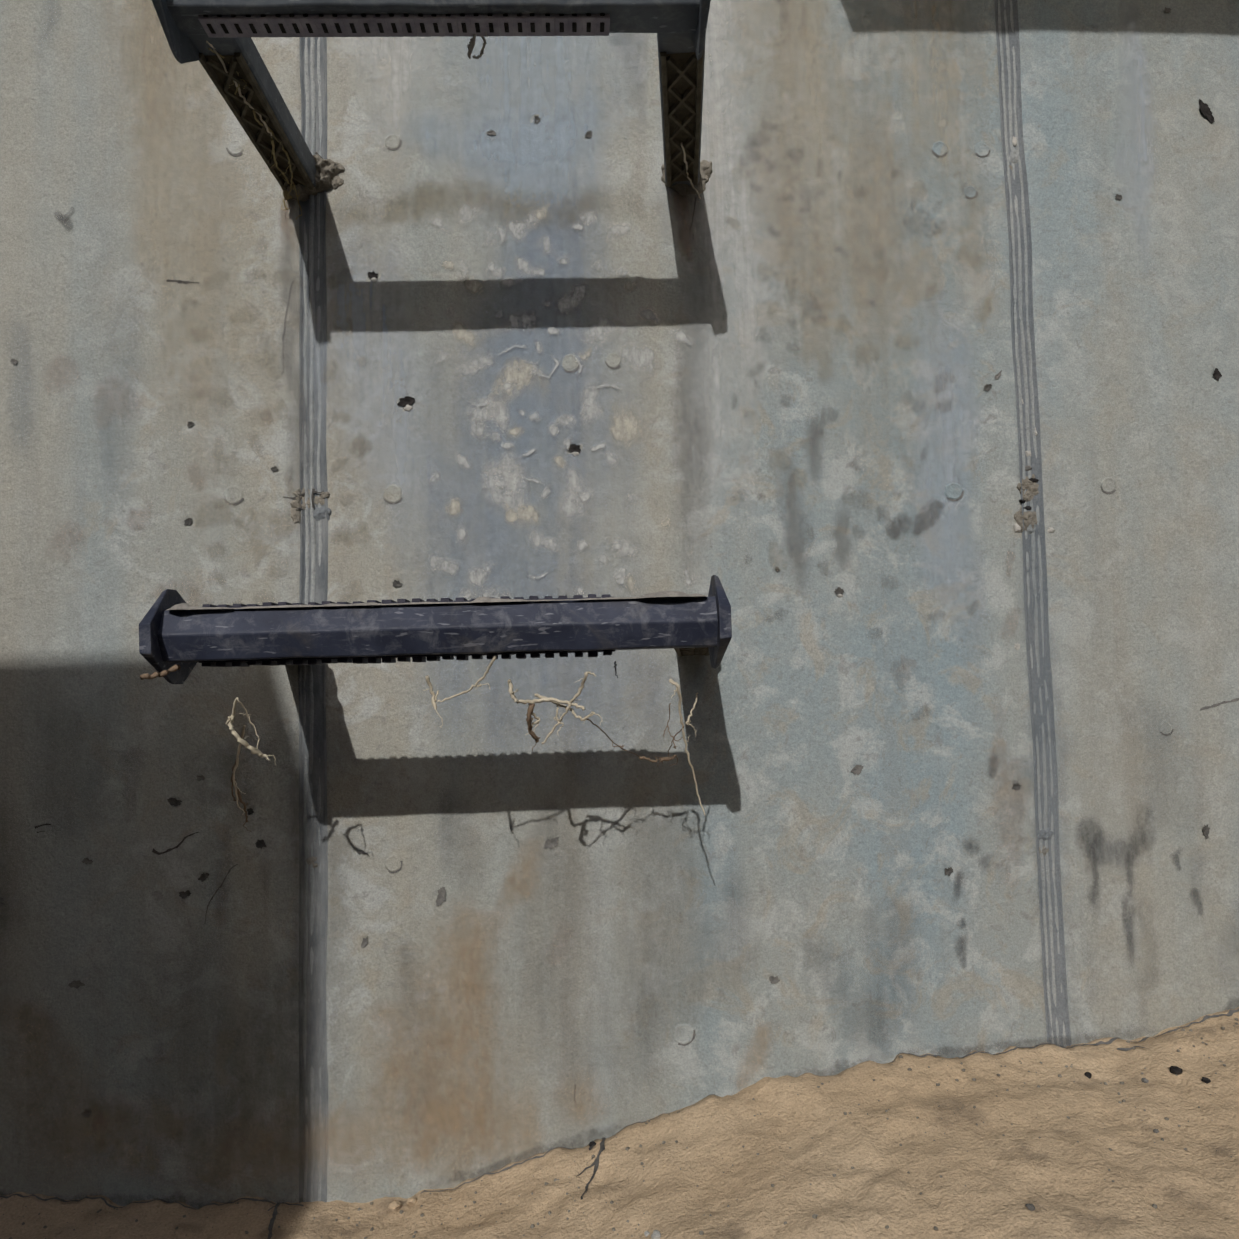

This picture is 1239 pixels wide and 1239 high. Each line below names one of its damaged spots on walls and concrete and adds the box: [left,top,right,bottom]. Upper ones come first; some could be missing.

water stain [444,262,480,293]
water stain [575,317,614,373]
water stain [472,343,559,550]
water stain [549,384,615,517]
water stain [591,413,638,464]